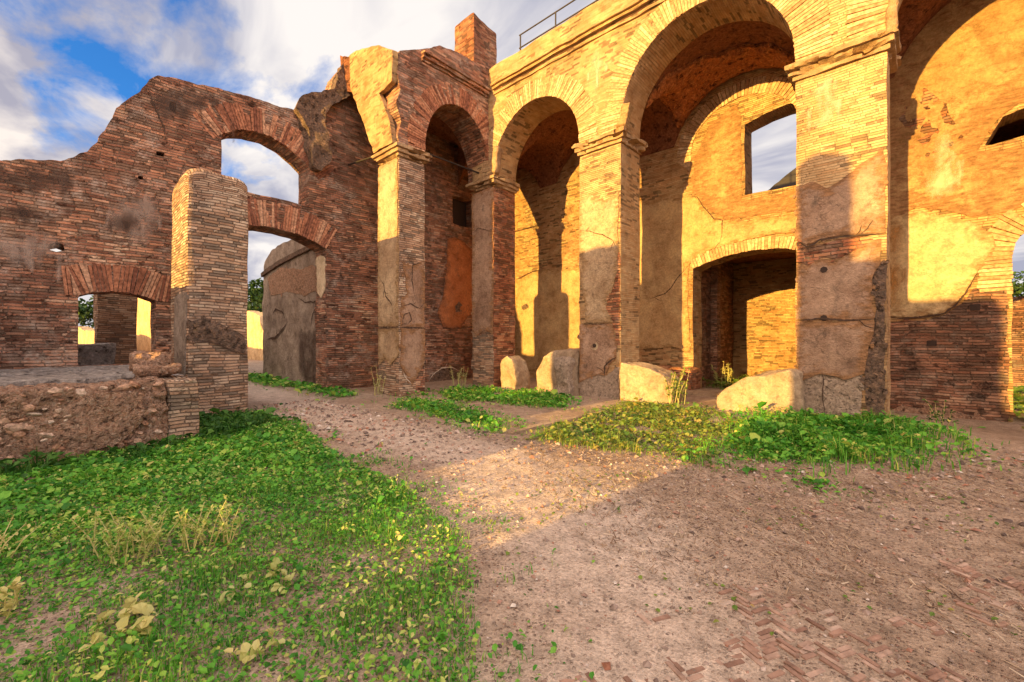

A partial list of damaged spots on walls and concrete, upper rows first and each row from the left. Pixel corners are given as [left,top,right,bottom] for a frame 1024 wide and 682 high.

crack [381,261,424,329]
flaking render [377,158,495,395]
flaking render [639,0,1024,422]
crack [795,220,873,248]